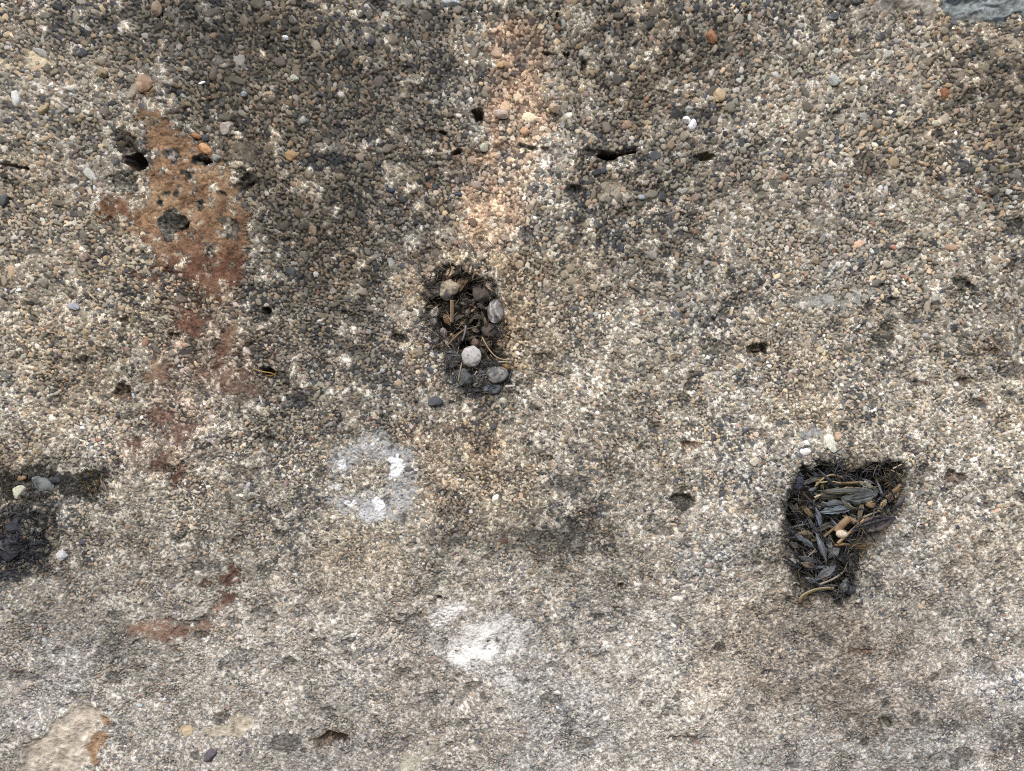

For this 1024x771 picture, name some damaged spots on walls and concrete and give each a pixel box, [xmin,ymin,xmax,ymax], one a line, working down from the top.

corrosion [94,92,263,397]
spalling [421,264,507,362]
spalling [11,467,60,497]
damp [332,485,385,524]
damp [387,452,405,480]
spalling [783,434,966,605]